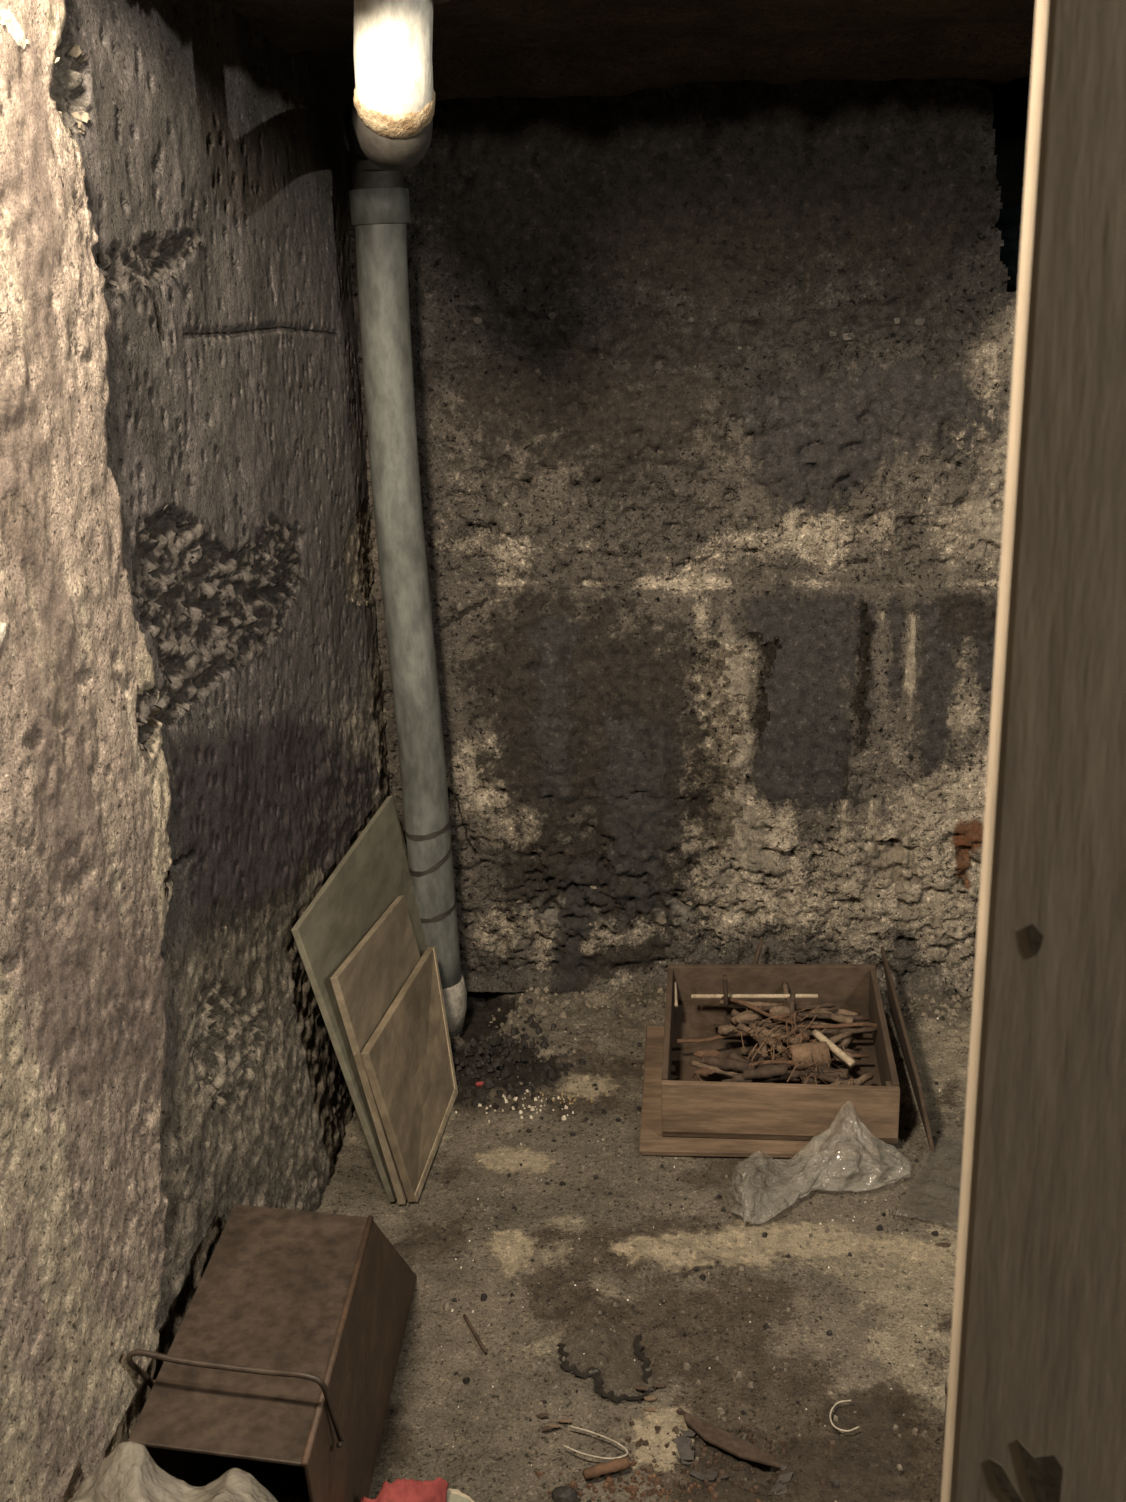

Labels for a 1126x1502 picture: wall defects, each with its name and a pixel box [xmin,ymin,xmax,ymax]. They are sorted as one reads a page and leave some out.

damp [455,300,1017,994]
rust [954,820,984,889]